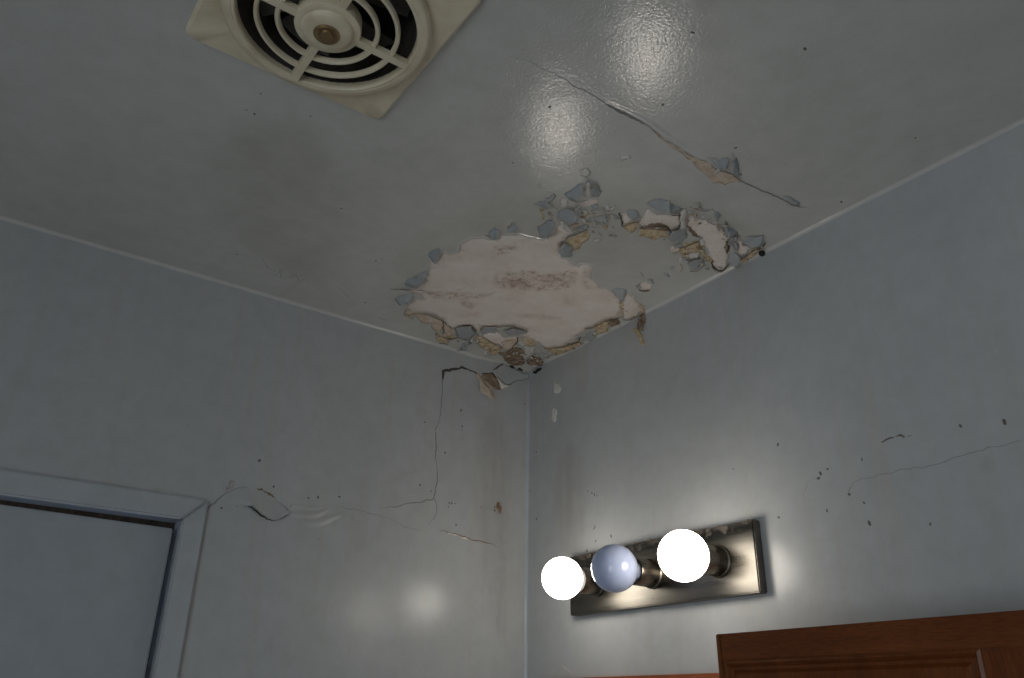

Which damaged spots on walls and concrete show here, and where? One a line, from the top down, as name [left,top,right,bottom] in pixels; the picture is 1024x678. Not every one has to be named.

crack [507,55,806,208]
peeling [390,198,766,399]
crack [387,366,497,547]